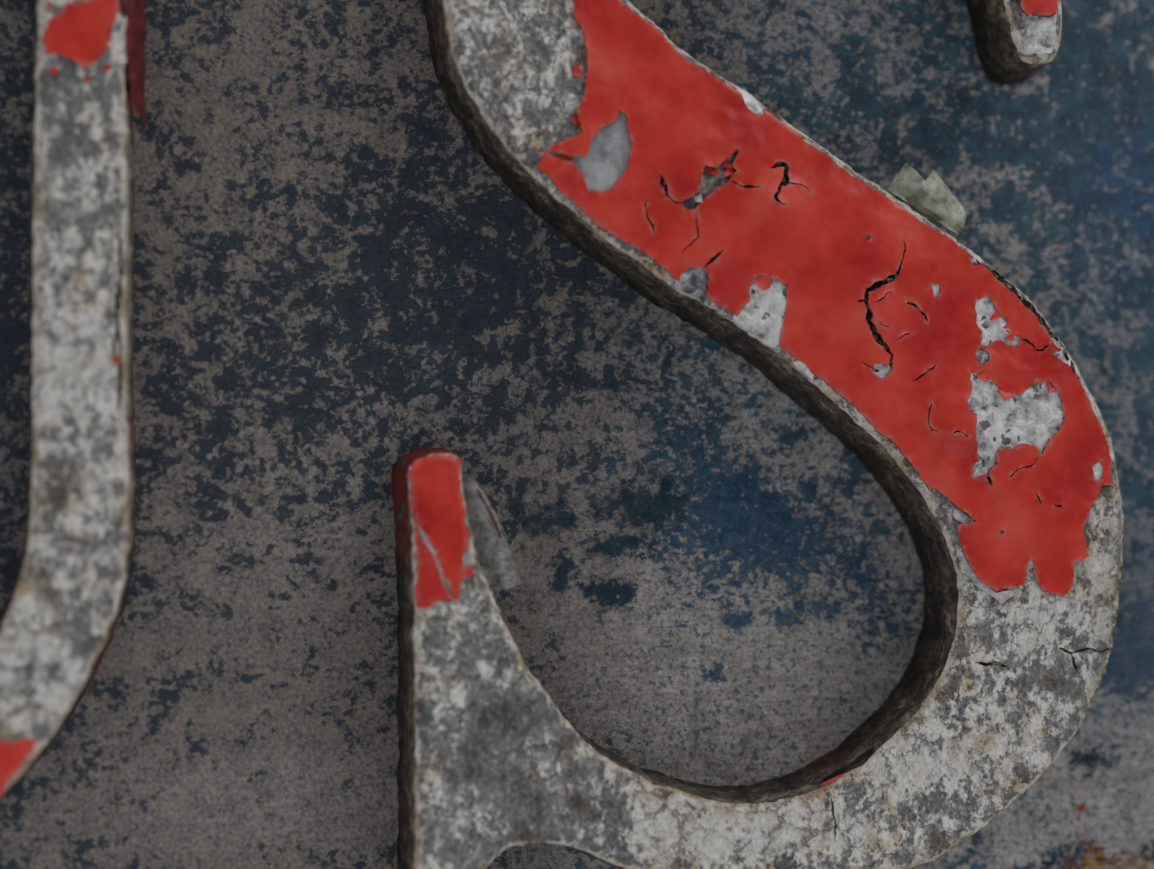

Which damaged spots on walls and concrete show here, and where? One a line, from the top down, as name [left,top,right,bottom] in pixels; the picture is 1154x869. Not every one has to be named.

peeling [119,0,147,125]
peeling [450,0,631,192]
peeling [736,87,766,116]
crack [645,177,722,268]
crack [733,162,794,202]
peeling [887,163,966,236]
crack [112,221,124,411]
peeling [733,273,787,352]
crack [857,242,936,381]
peeling [968,296,1063,477]
peeling [518,400,924,655]
corrosion [1052,841,1154,869]